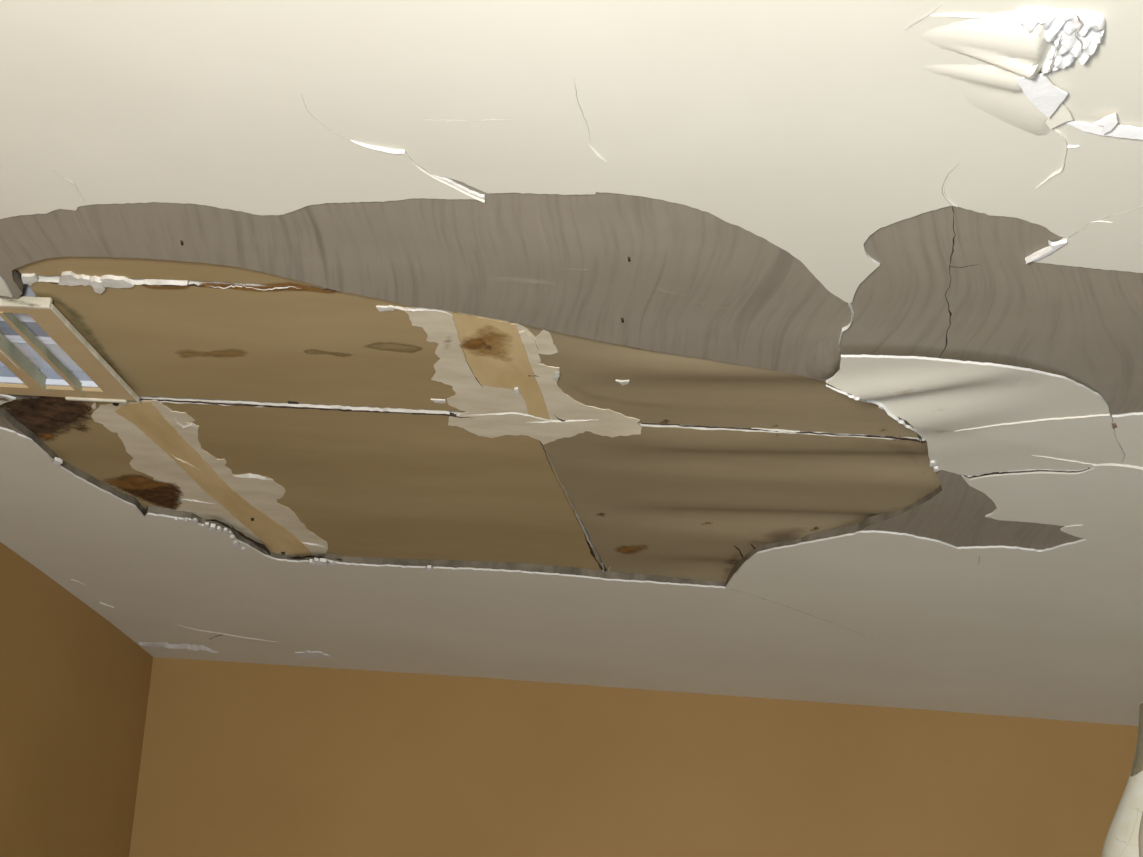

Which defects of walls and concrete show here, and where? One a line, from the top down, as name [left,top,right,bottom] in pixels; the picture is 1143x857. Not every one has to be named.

crack [301,94,485,203]
flaking render [0,177,1143,415]
crack [939,164,978,358]
flaking render [1014,8,1143,189]
crack [1069,207,1143,238]
leakage [0,395,91,438]
flaking render [0,406,1083,587]
crack [954,413,1143,480]